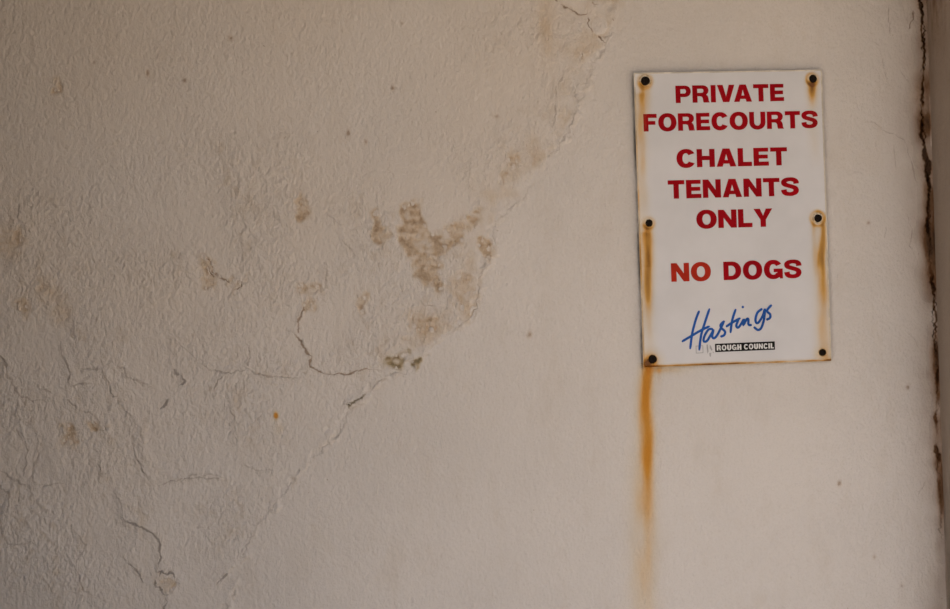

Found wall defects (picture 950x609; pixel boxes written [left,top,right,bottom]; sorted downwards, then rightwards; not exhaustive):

crack [918,0,940,423]
crack [934,446,944,509]